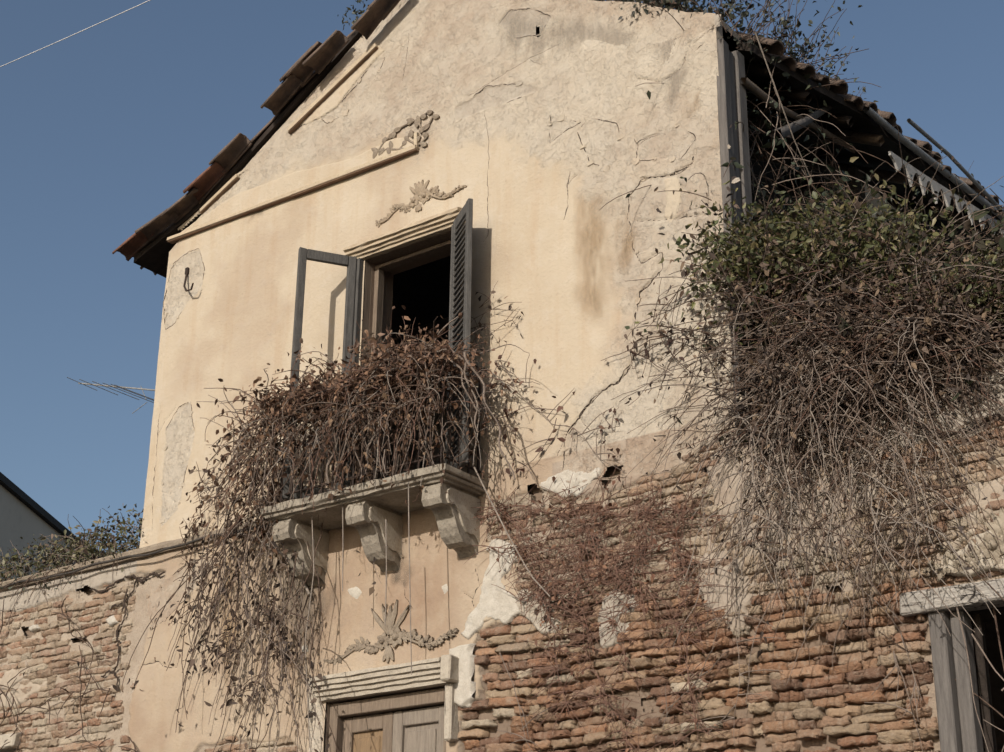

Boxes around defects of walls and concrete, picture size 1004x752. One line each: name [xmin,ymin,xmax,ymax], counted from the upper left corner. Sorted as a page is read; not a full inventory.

crack [470,44,559,242]
peeling [162,248,206,330]
crack [557,149,705,460]
peeling [159,401,195,526]
flaking render [120,735,132,751]
flaking render [204,736,304,752]